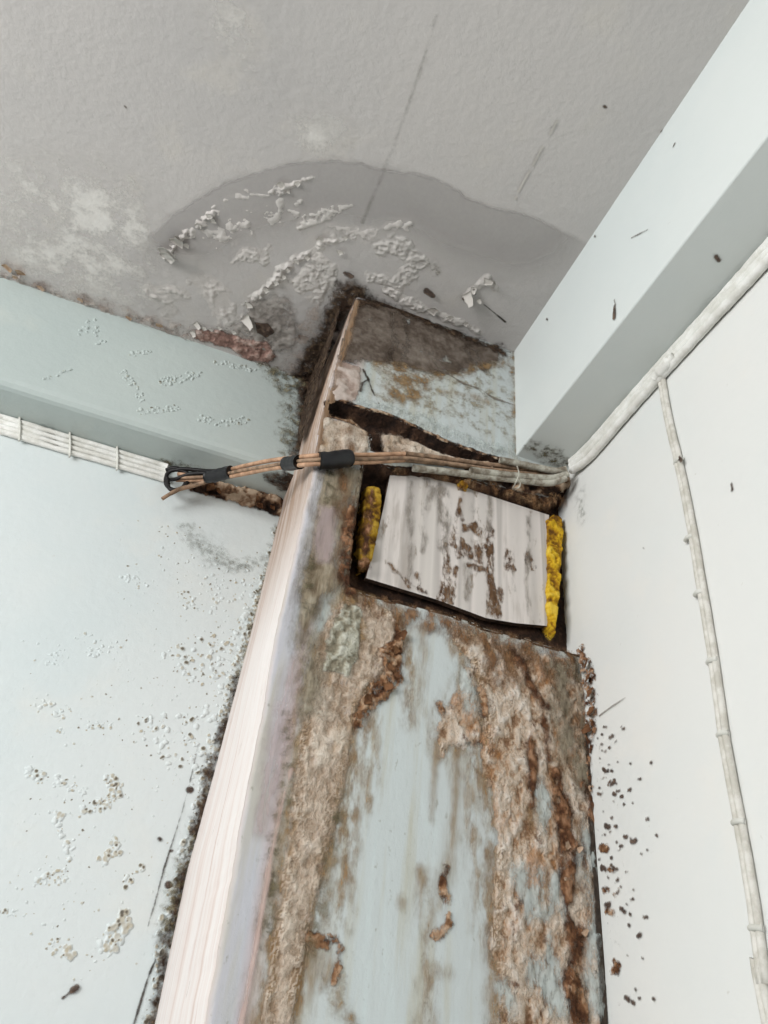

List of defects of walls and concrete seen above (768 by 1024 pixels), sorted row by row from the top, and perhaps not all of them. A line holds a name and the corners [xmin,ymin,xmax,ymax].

peeling [157,176,315,264]
leakage [6,122,561,302]
leakage [255,322,274,337]
peeling [381,285,484,336]
peeling [461,272,500,307]
flaking render [332,362,516,468]
leakage [294,467,375,716]
leakage [142,526,277,1024]
flaking render [238,417,605,1024]
leakage [549,663,641,806]
leakage [598,811,648,938]
leakage [611,958,621,975]